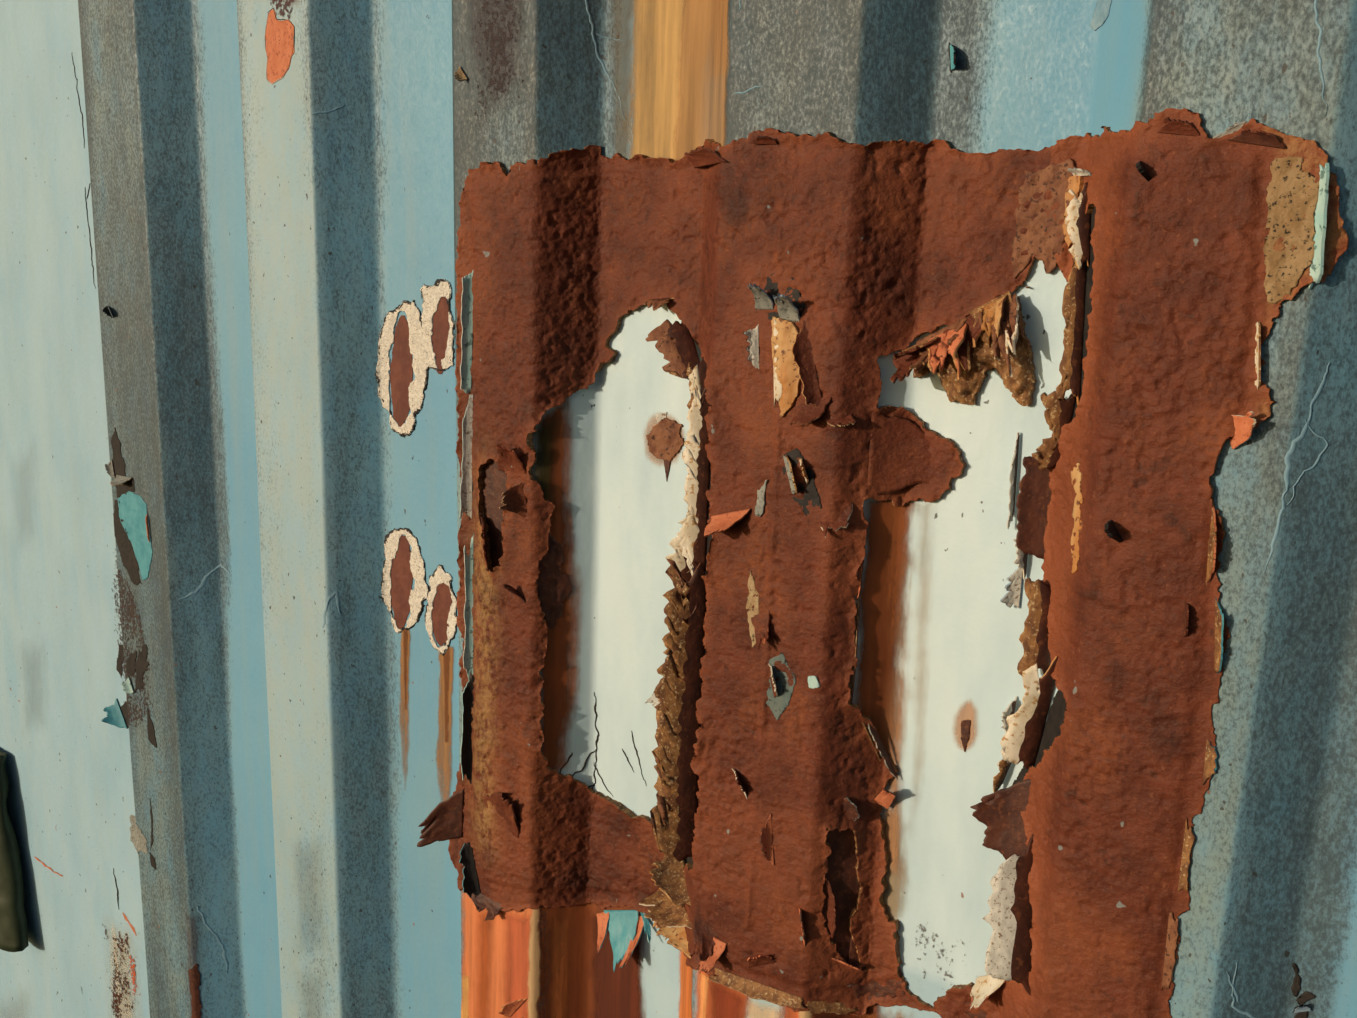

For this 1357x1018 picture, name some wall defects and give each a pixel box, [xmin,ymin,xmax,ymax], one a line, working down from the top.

rust [646,412,685,481]
peeling [101,428,157,748]
rust [534,407,576,770]
peeling [417,108,1349,1018]
rust [855,499,911,920]
rust [956,704,974,752]
rust [461,889,641,1018]
rust [679,952,748,1018]
rust [782,1004,879,1018]